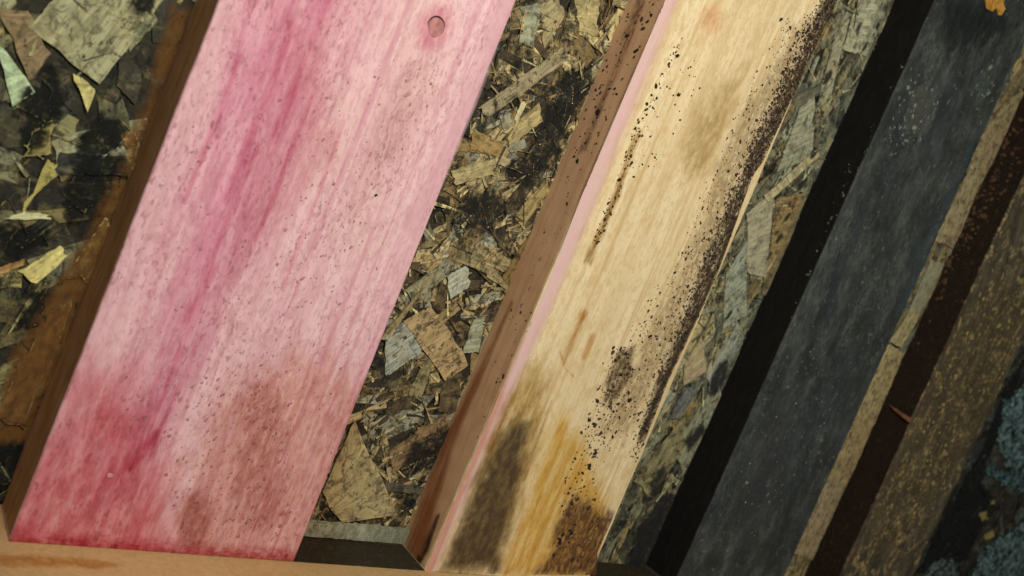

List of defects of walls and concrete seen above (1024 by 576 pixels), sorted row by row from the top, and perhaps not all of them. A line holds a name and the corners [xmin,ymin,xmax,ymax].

leakage [0,0,248,534]
leakage [294,0,701,574]
leakage [535,0,1024,576]